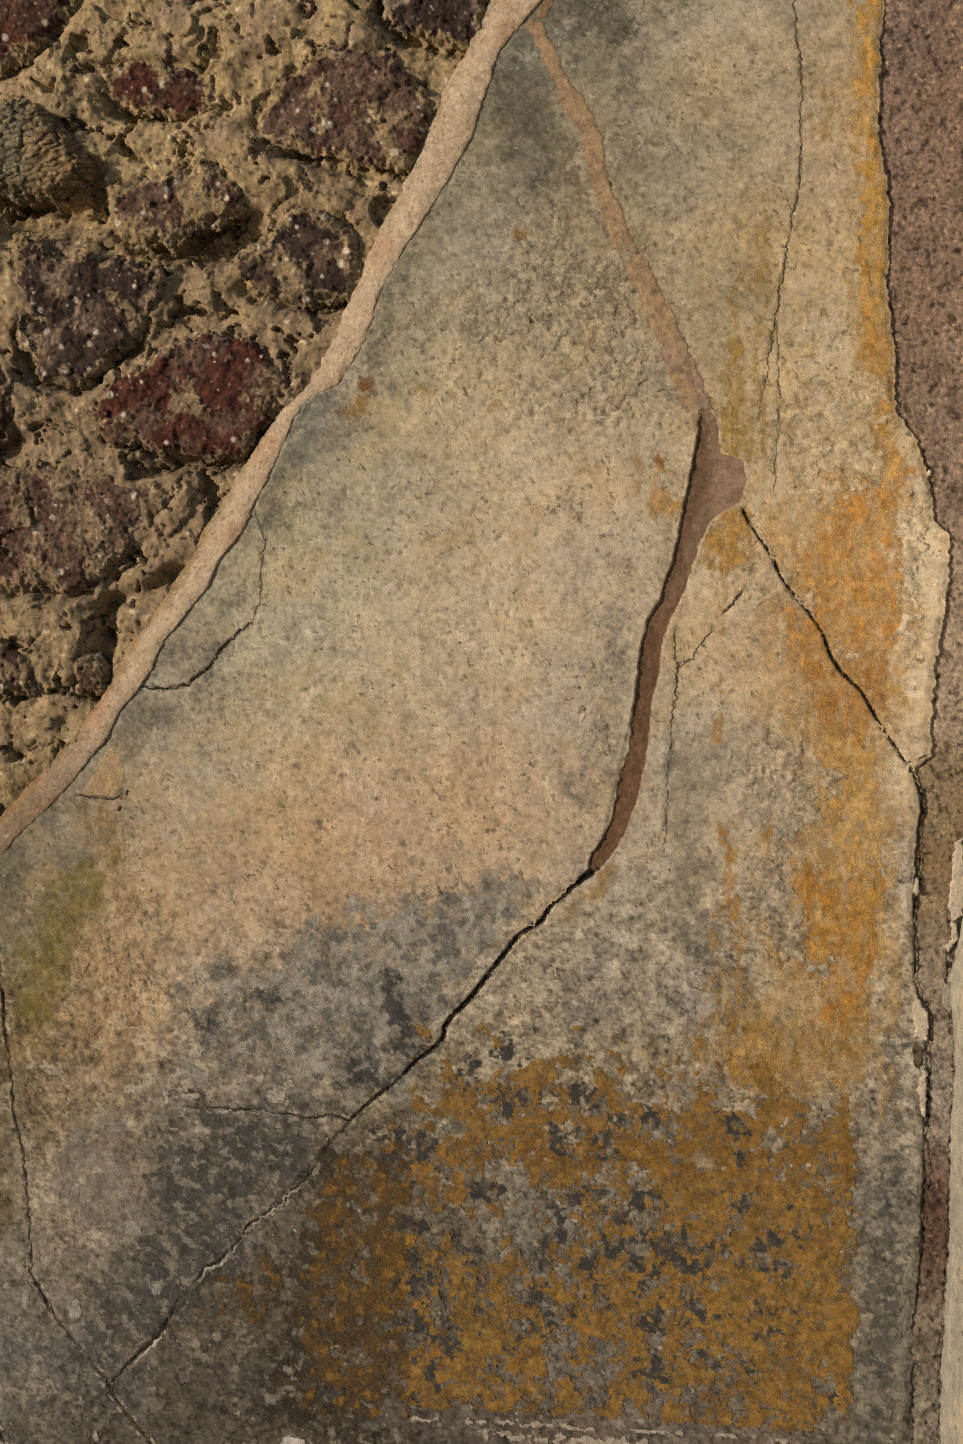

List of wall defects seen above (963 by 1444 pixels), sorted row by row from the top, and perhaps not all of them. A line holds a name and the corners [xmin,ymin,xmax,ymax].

crack [78,792,121,800]
crack [142,512,266,692]
crack [179,0,933,1250]
crack [0,988,317,1444]
crack [935,1008,956,1443]